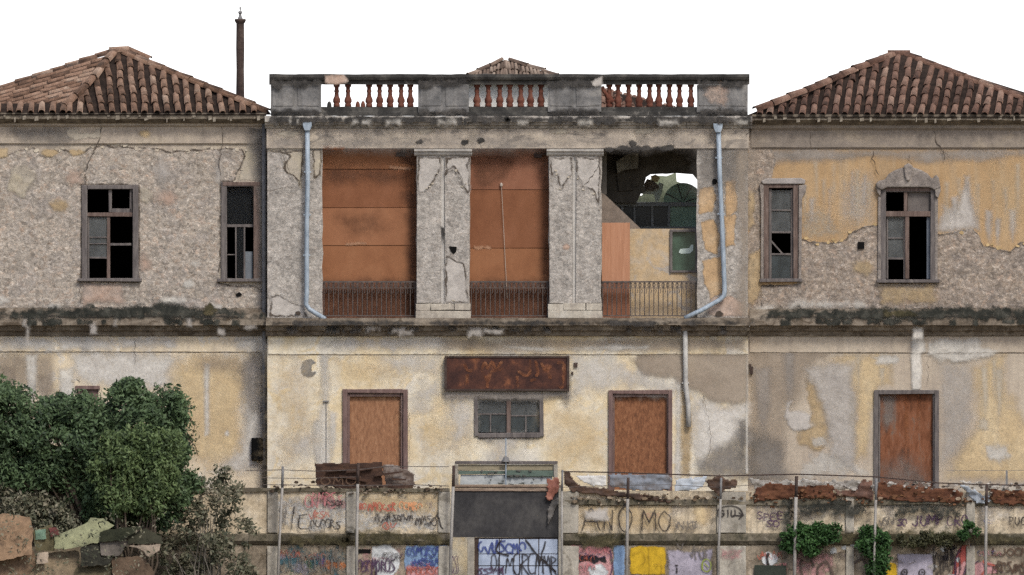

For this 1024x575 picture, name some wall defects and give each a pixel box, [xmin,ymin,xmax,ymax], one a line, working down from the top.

flaking render [417,138,485,194]
flaking render [550,140,674,205]
spalling [748,128,1024,309]
spalling [0,128,307,389]
water stain [780,301,864,326]
water stain [0,355,74,402]
water stain [430,275,825,480]
peeling [929,338,997,362]
water stain [222,355,262,471]
water stain [801,437,868,478]
corrosion [754,479,963,503]
corrosion [990,489,1024,506]